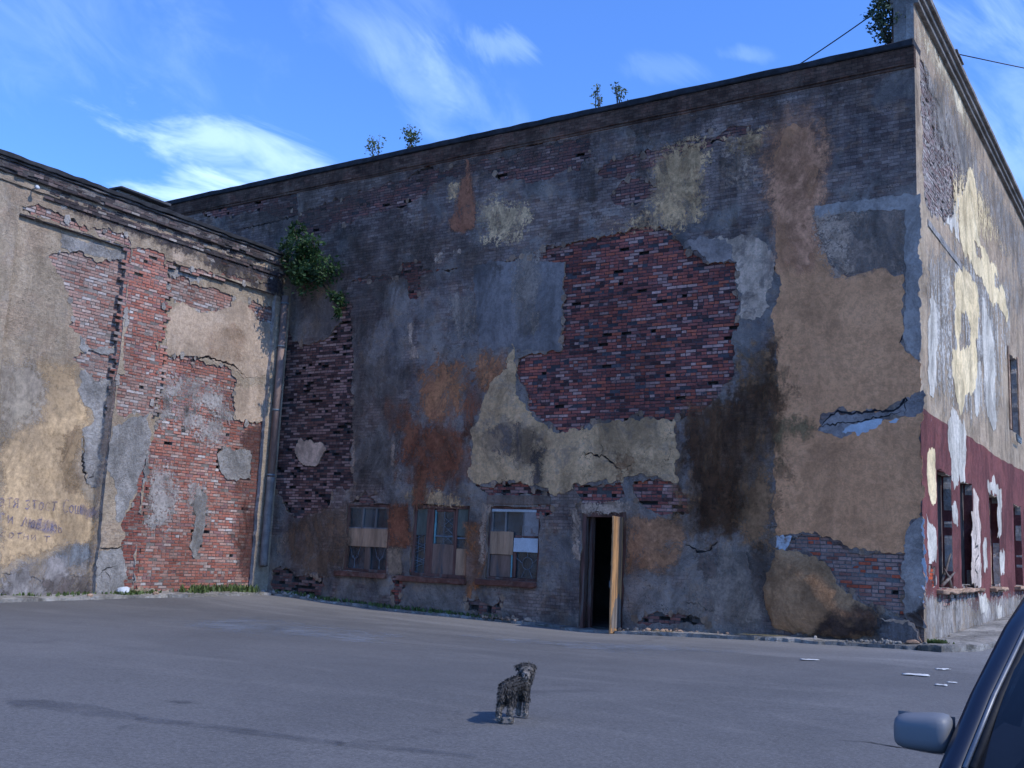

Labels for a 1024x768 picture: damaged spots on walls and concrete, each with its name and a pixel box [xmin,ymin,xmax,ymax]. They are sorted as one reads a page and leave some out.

spalling [19,204,276,592]
spalling [275,303,357,518]
spalling [506,226,740,433]
leakage [624,336,816,625]
peeling [771,61,1024,619]